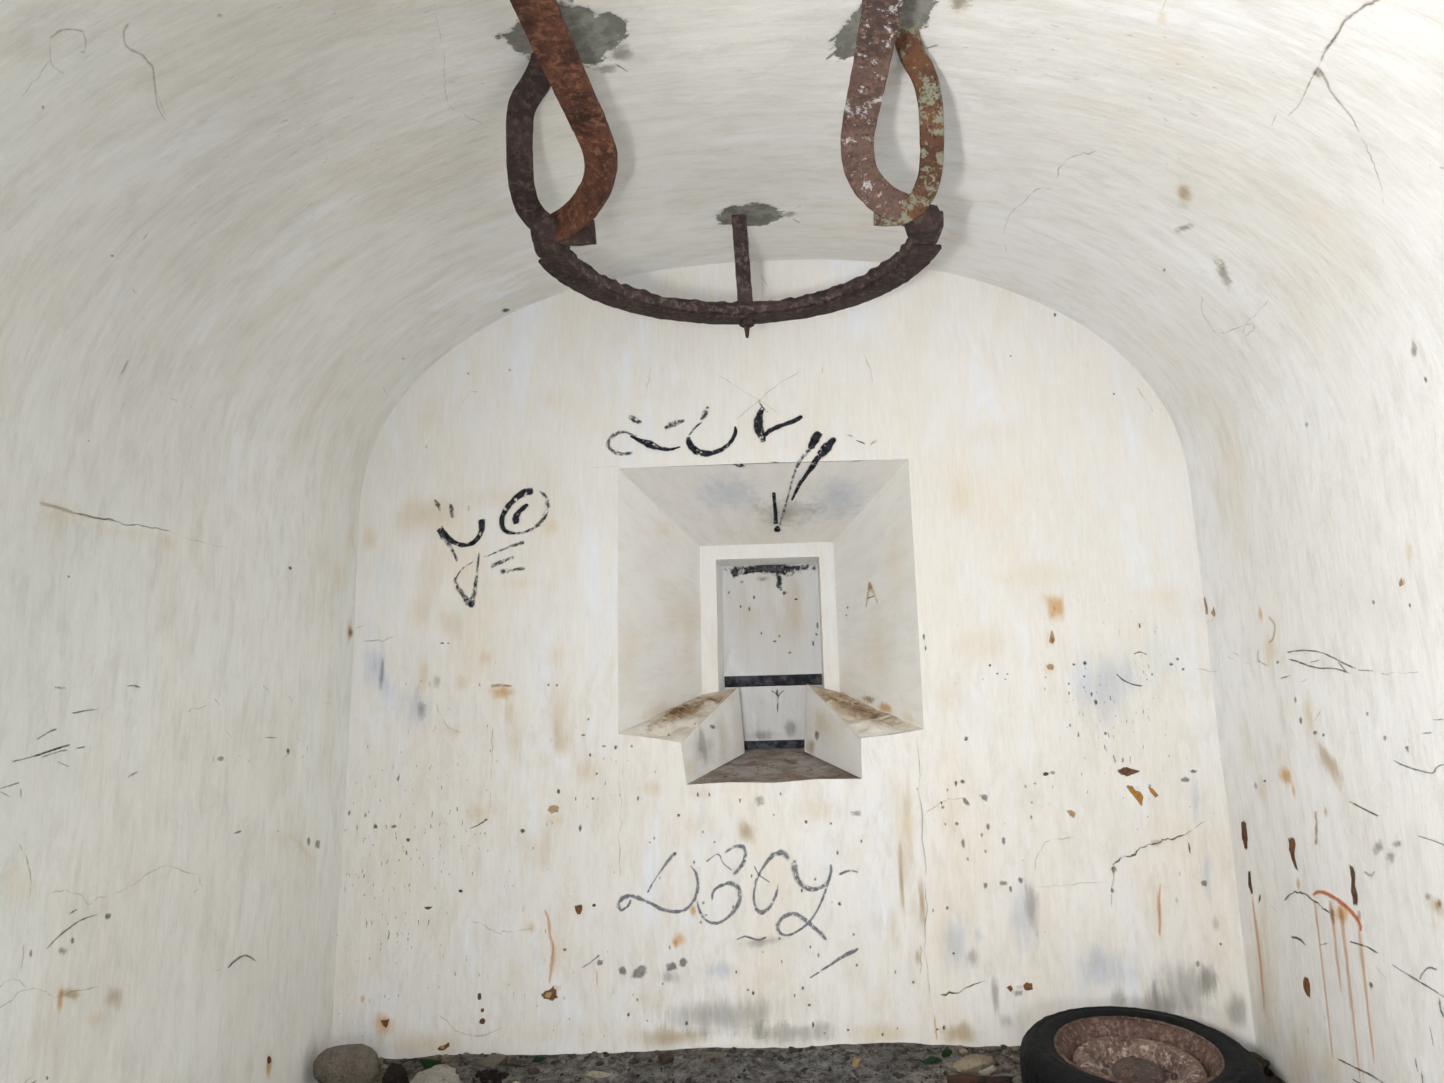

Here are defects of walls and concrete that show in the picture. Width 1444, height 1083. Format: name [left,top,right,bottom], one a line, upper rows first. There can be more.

rust [1288,838,1298,870]